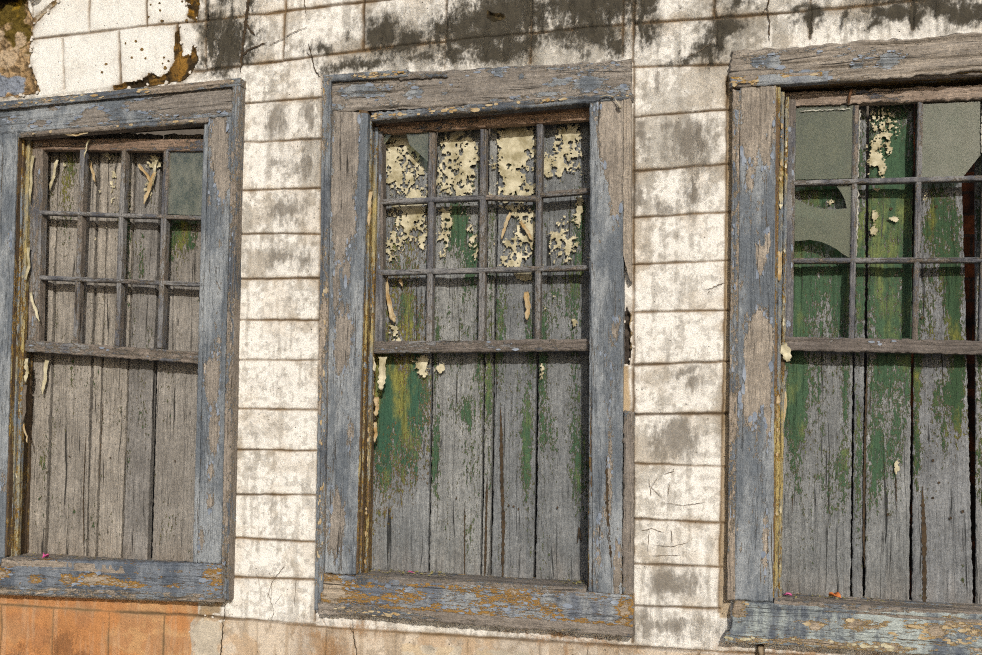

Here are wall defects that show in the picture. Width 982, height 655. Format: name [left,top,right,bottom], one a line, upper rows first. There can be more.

spalling [0,0,61,109]
spalling [66,0,238,132]
damp [303,0,662,75]
damp [656,0,755,87]
damp [789,2,824,36]
damp [840,0,982,32]
damp [662,119,708,163]